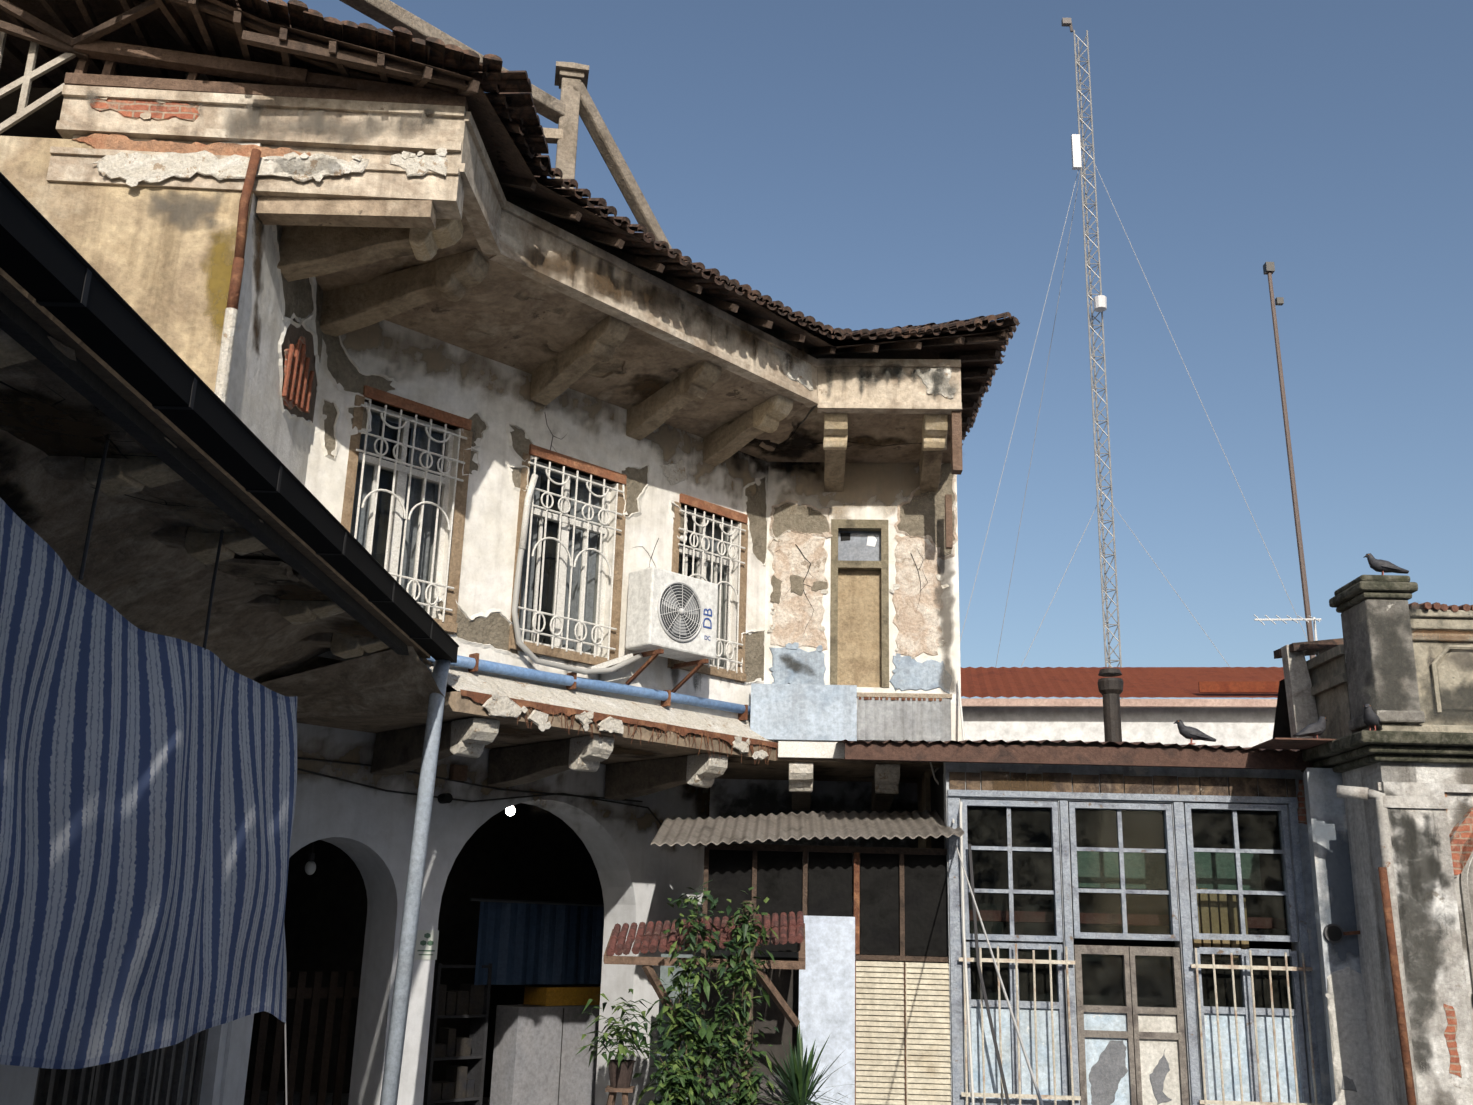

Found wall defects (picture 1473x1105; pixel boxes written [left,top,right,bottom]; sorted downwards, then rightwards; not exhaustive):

peeling [72,97,369,187]
peeling [390,148,448,177]
spalling [271,225,399,461]
peeling [740,474,833,686]
peeling [889,463,958,694]
damp [1367,605,1473,722]
damp [1462,764,1473,784]
flaking render [1444,792,1473,876]
damp [1386,792,1473,1071]
flaking render [1443,1003,1462,1078]